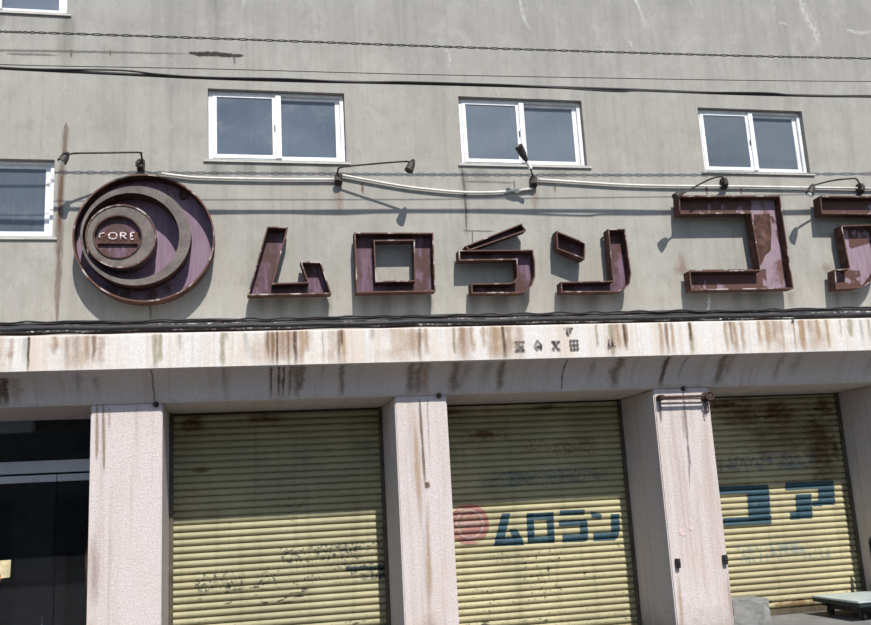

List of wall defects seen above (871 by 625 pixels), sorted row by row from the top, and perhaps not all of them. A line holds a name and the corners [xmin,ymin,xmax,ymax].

corrosion [55,165,64,319]
corrosion [267,331,307,391]
corrosion [416,400,430,487]